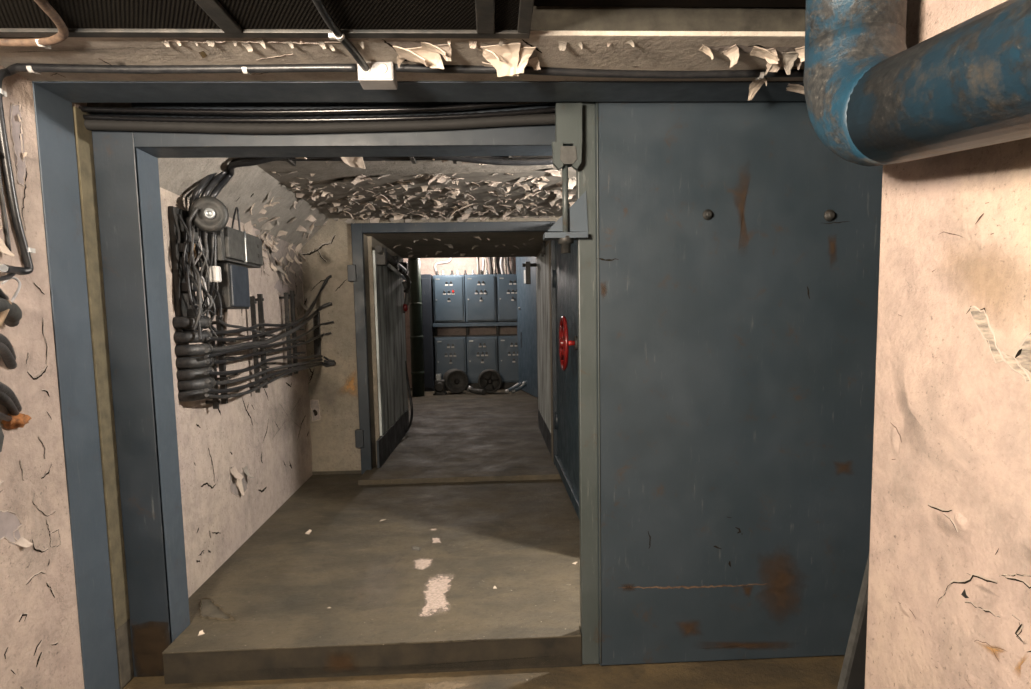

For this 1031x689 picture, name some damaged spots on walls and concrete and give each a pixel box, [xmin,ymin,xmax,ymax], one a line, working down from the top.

peeling [157,38,369,52]
peeling [382,39,452,69]
peeling [468,39,542,77]
peeling [699,44,805,101]
peeling [9,102,27,231]
peeling [0,225,15,257]
peeling [243,157,576,320]
peeling [966,306,1031,383]
spalling [229,465,254,497]
peeling [0,510,33,548]
crack [928,503,958,532]
crack [937,548,1031,660]